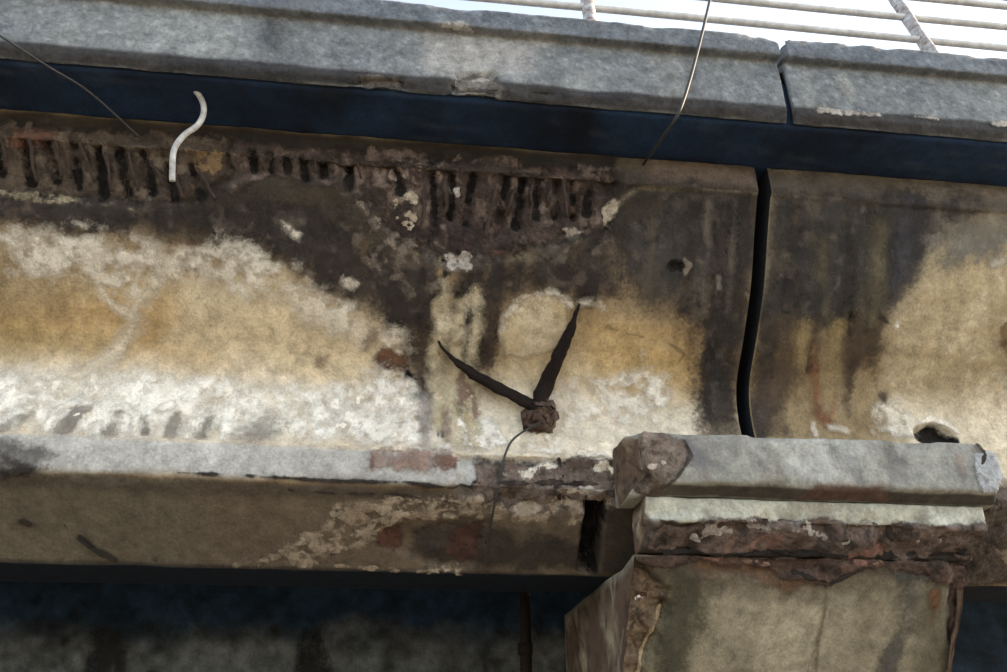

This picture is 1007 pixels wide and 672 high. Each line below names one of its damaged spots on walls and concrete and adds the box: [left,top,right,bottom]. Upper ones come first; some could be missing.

spalling [0,122,620,332]
water stain [0,173,757,455]
water stain [750,187,1007,438]
spalling [260,449,616,571]
spalling [634,431,693,495]
spalling [623,443,1007,672]